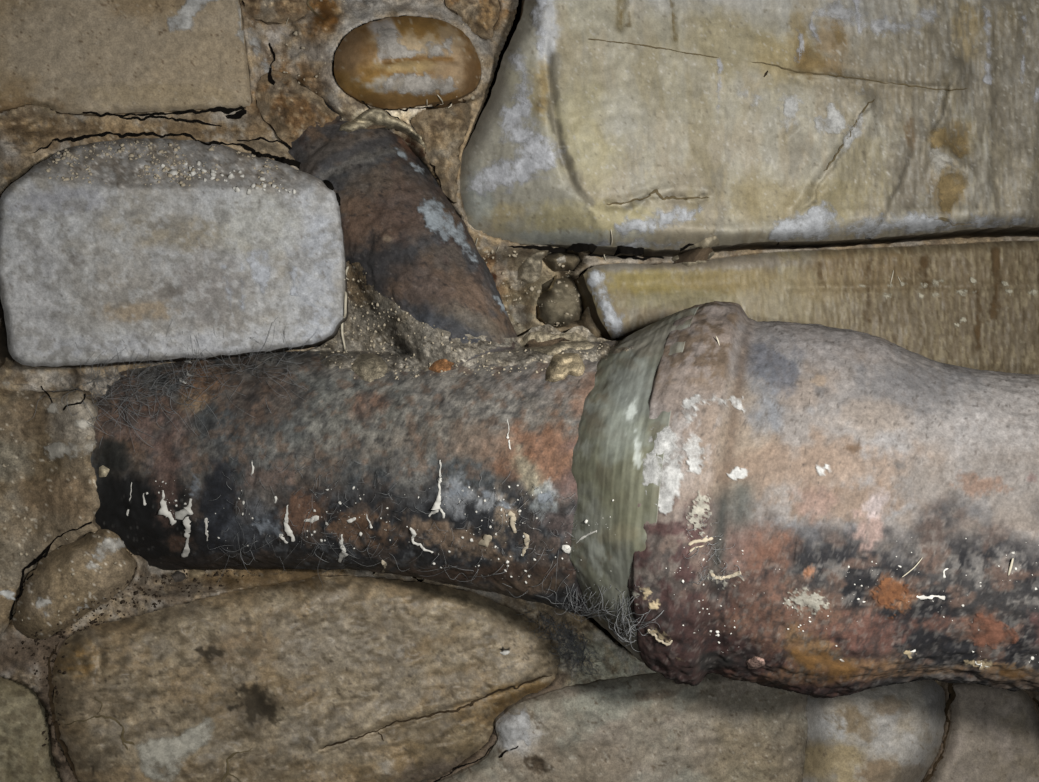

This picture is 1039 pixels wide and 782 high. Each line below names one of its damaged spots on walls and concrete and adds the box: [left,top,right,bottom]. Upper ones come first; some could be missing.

crack [589,38,718,58]
crack [29,106,301,169]
crack [323,180,341,206]
damp [683,394,744,421]
damp [643,427,703,514]
damp [727,467,747,480]
damp [686,491,712,553]
crack [9,521,92,621]
damp [785,588,830,615]
rust [970,613,1019,649]
crack [323,675,552,749]